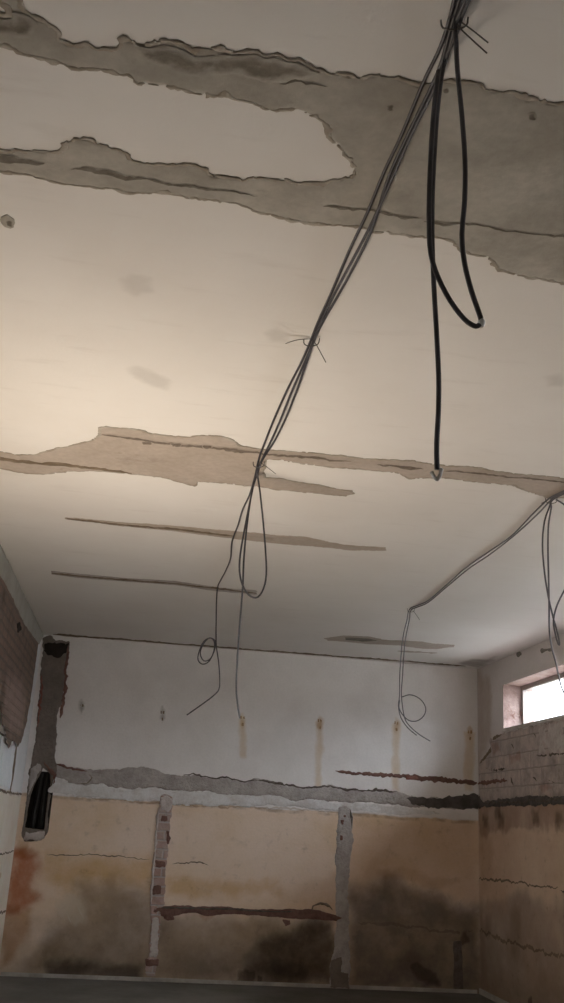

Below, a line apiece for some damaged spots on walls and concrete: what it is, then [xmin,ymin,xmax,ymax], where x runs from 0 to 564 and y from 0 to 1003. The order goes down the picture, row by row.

spalling [0,0,564,285]
spalling [0,426,564,498]
spalling [65,517,386,551]
spalling [51,571,257,595]
spalling [324,636,455,654]
flaking render [0,576,43,789]
rust [311,713,327,787]
flaking render [479,720,564,802]
peeling [48,764,453,840]
water stain [8,802,564,1003]
crack [479,877,564,893]
crack [479,928,564,959]